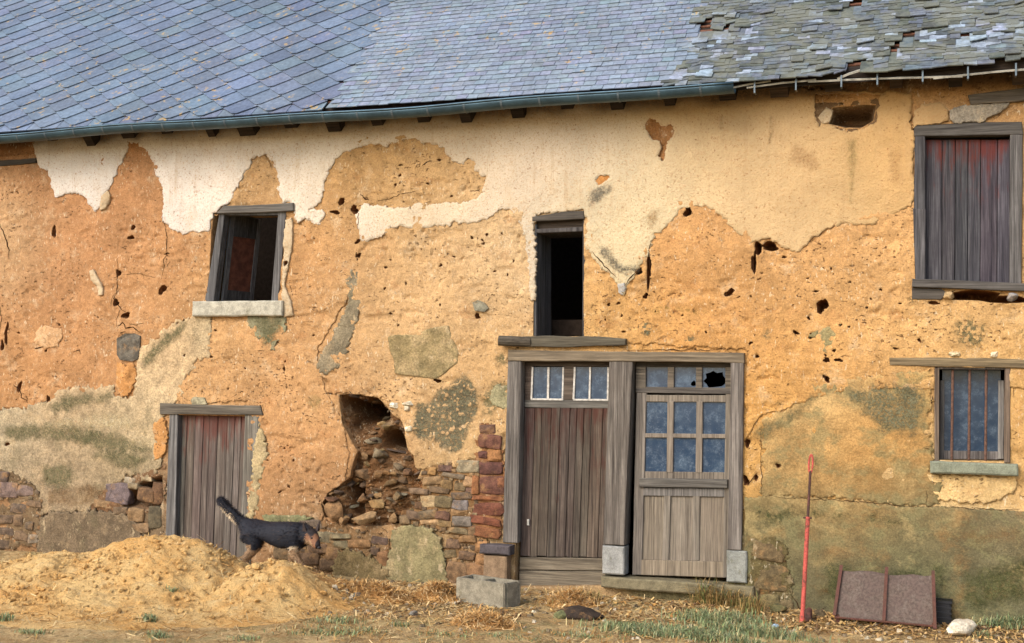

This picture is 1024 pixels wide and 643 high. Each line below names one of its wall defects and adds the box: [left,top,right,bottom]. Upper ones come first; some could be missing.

flaking render [645,118,675,161]
flaking render [815,98,880,132]
flaking render [0,142,213,410]
flaking render [176,135,535,584]
flaking render [584,200,1024,448]
leakage [6,393,149,466]
leakage [415,376,504,452]
leakage [848,384,923,437]
leakage [43,466,71,500]
crack [747,426,1011,510]